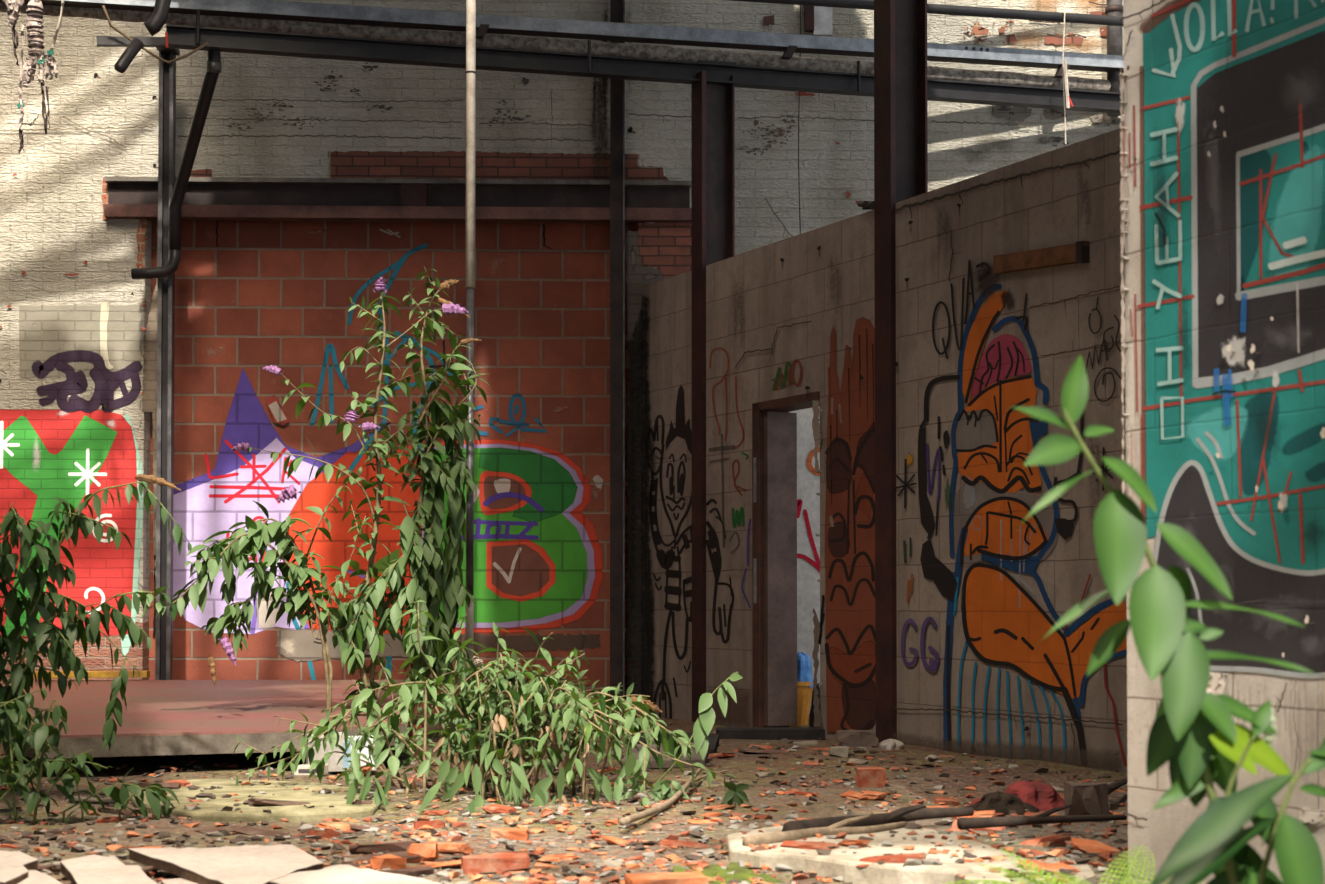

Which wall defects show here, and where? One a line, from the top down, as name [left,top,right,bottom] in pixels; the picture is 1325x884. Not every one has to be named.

peeling [963,0,1107,47]
peeling [740,115,796,155]